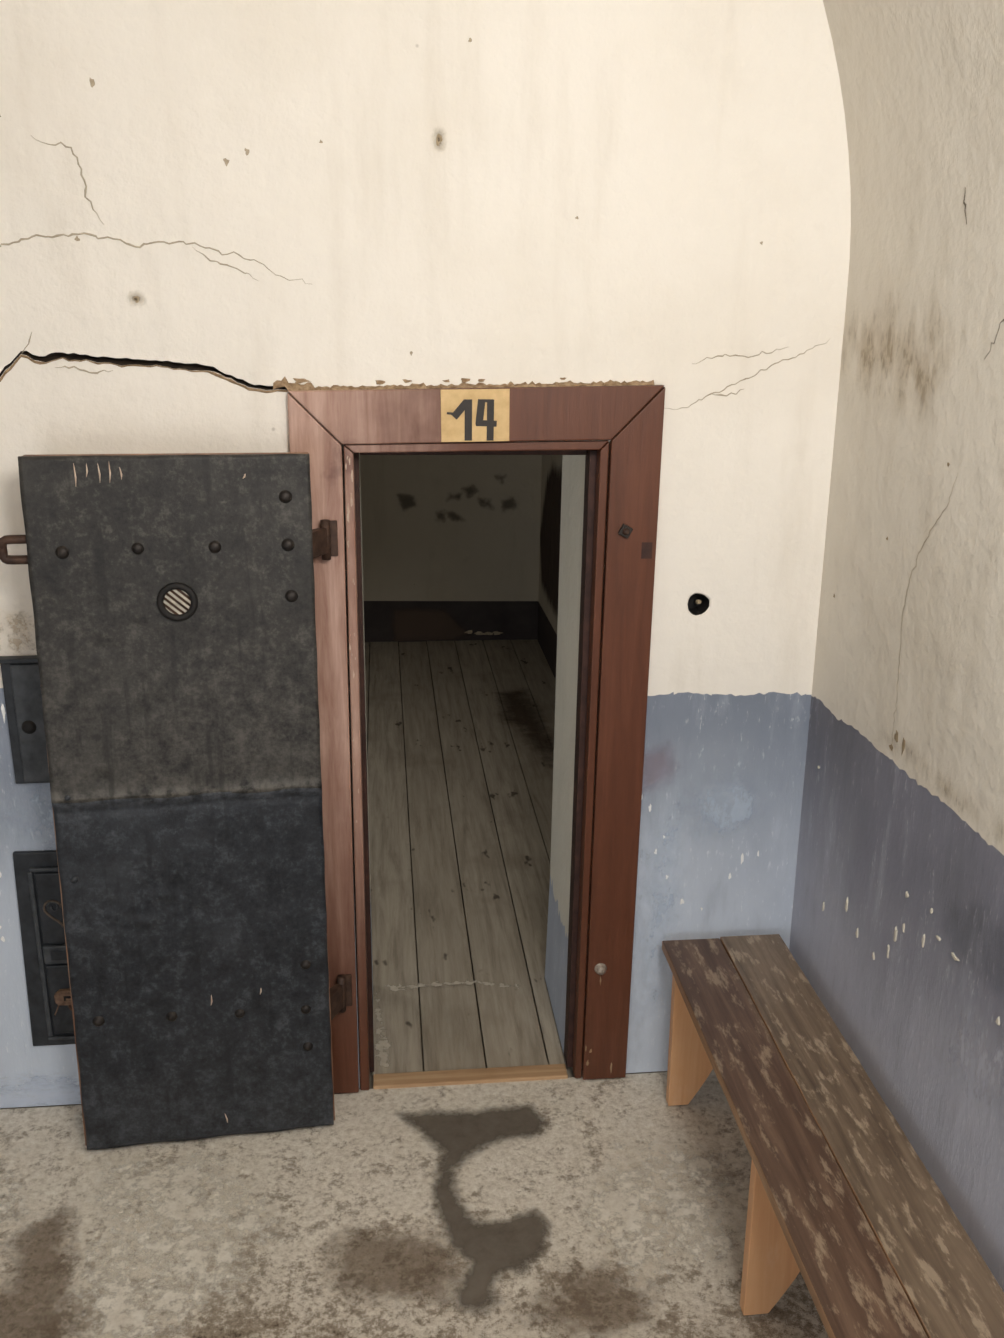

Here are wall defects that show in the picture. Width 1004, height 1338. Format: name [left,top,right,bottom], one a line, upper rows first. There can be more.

crack [0,137,307,284]
crack [0,332,288,393]
crack [667,341,828,410]
leakage [889,474,958,756]
leakage [0,1217,69,1338]
leakage [333,1106,549,1310]